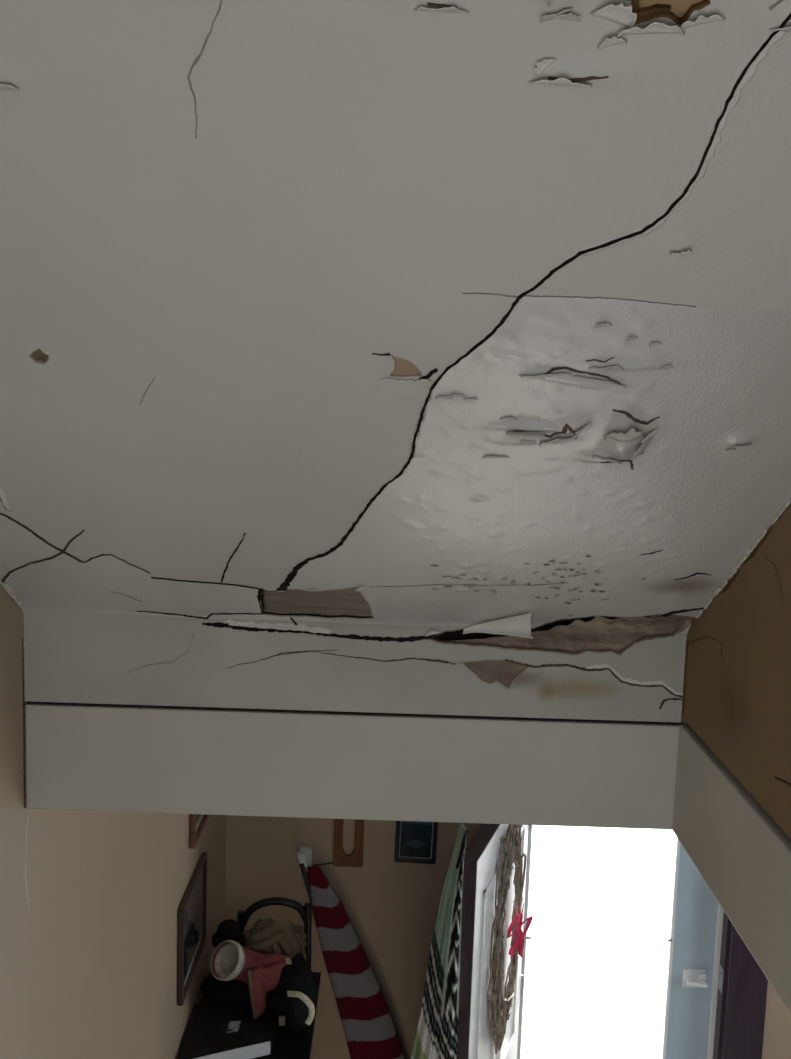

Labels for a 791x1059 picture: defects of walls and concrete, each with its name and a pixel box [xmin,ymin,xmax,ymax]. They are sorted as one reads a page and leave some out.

flaking render [540,0,726,50]
peeling [528,58,609,88]
crack [0,0,791,673]
flaking render [29,348,49,364]
flaking render [372,353,432,383]
flaking render [260,586,374,620]
flaking render [425,497,791,689]